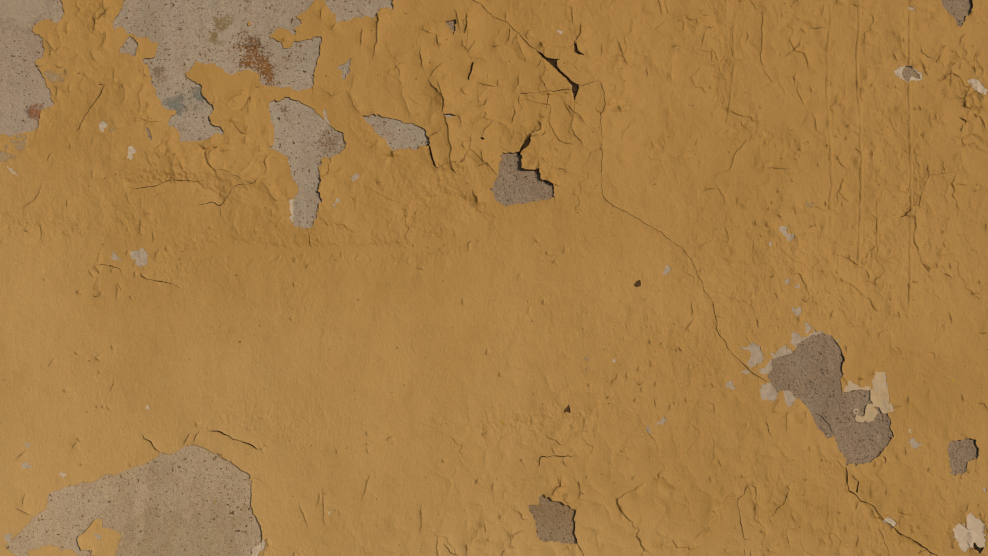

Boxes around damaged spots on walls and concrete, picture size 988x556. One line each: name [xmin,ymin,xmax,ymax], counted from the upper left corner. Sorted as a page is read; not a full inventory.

peeling [0,0,64,137]
peeling [113,0,607,229]
peeling [894,31,988,157]
peeling [941,0,973,26]
crack [473,0,767,382]
peeling [4,444,265,556]
peeling [468,454,583,556]
peeling [739,307,897,528]
crack [846,468,938,556]
peeling [923,488,988,556]
peeling [947,438,978,476]